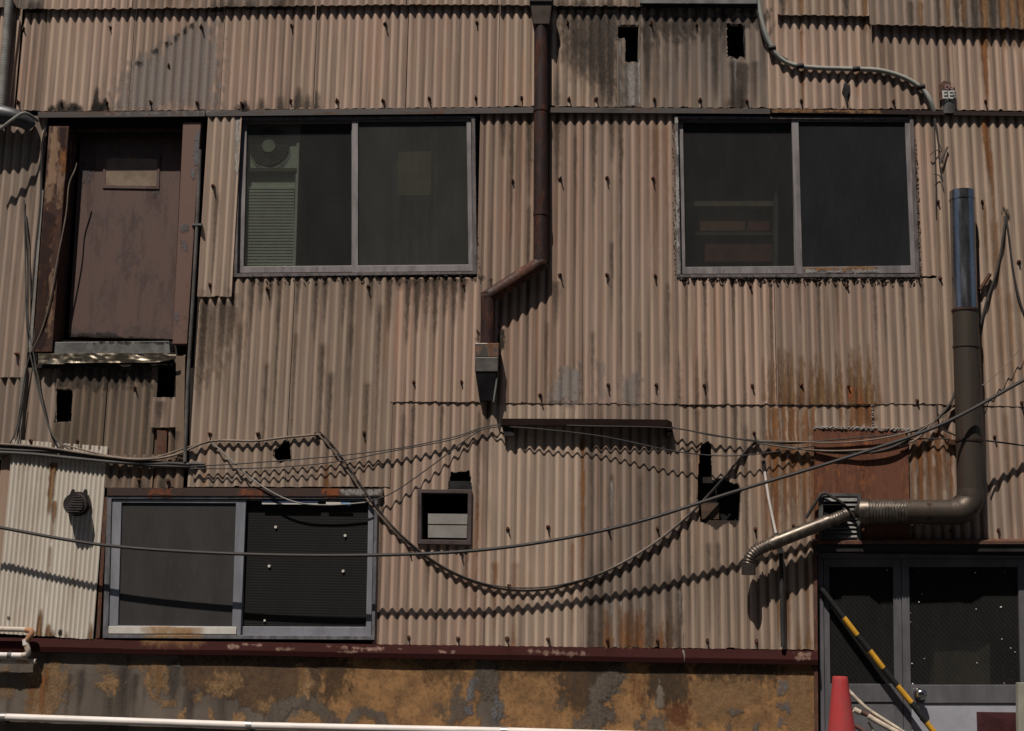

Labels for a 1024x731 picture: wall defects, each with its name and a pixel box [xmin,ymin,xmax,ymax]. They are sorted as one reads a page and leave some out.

peeling [125,643,814,731]